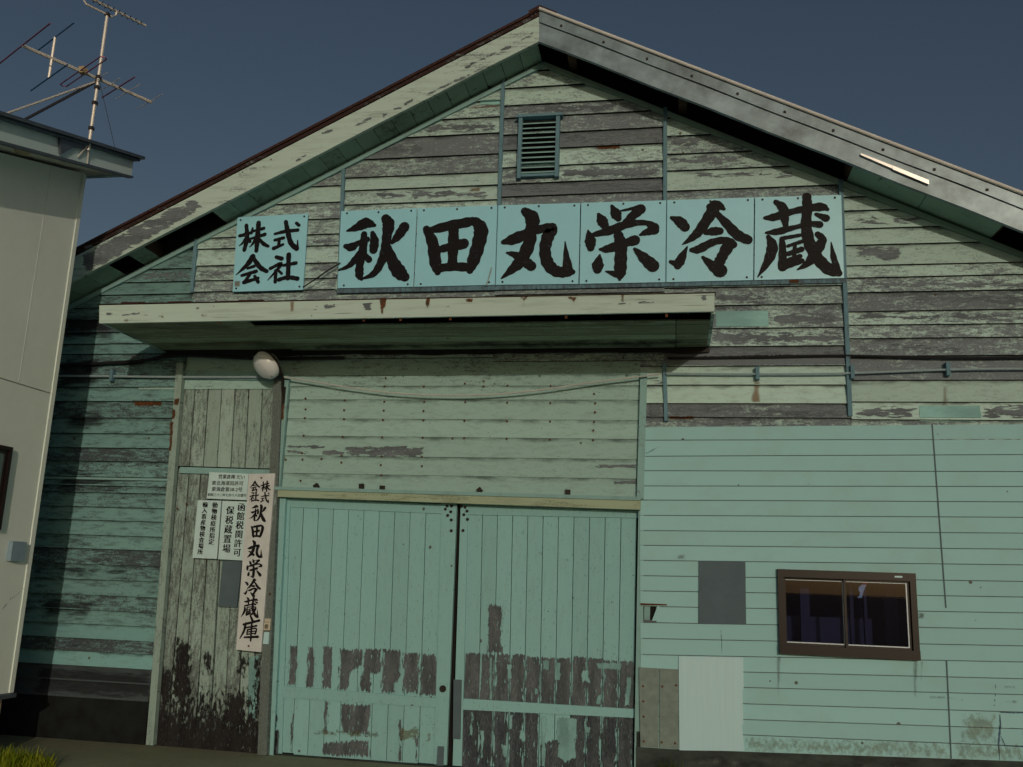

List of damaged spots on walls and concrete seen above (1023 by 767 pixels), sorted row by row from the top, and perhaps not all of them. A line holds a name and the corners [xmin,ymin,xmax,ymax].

peeling [376,190,487,199]
peeling [82,200,201,271]
peeling [856,246,901,261]
water stain [68,412,102,426]
peeling [982,405,1023,421]
peeling [287,445,424,457]
water stain [60,469,116,489]
water stain [43,599,92,615]
peeling [287,645,437,696]
water stain [35,637,262,753]
peeling [461,604,634,767]
peeling [322,702,371,758]